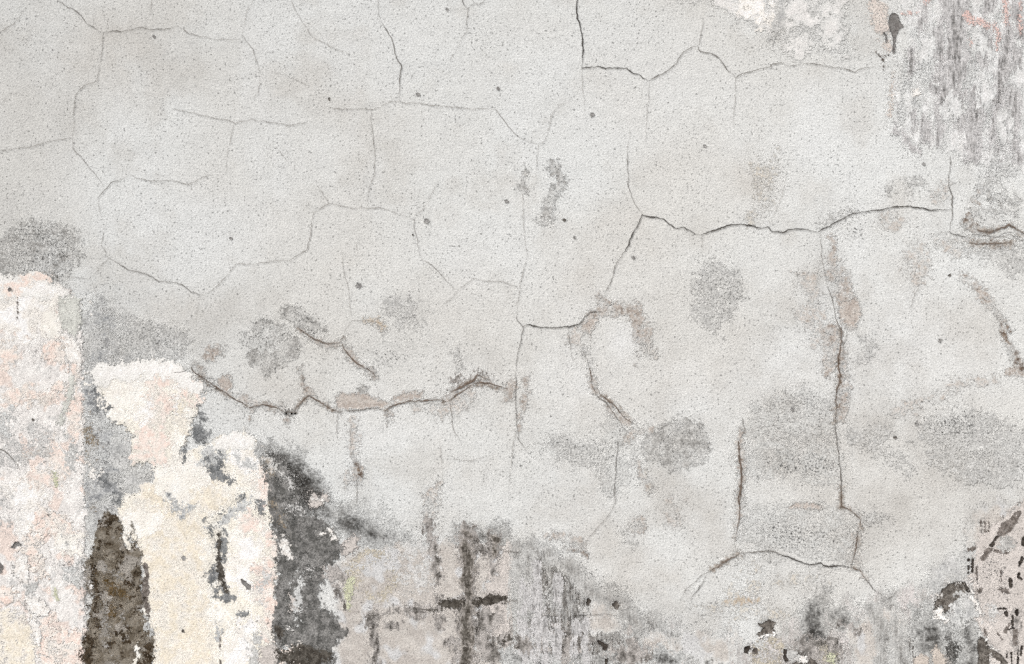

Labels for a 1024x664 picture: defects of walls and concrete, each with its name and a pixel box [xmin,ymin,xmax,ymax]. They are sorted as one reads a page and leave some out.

water stain [77,293,184,664]
peeling [0,217,282,664]
crack [5,0,308,206]
flaking render [239,302,328,380]
crack [74,9,639,550]
water stain [495,528,730,664]
crack [576,0,1024,601]
flaking render [641,383,1024,664]
spalling [875,13,904,70]
flaking render [881,162,929,201]
flaking render [963,179,1024,284]